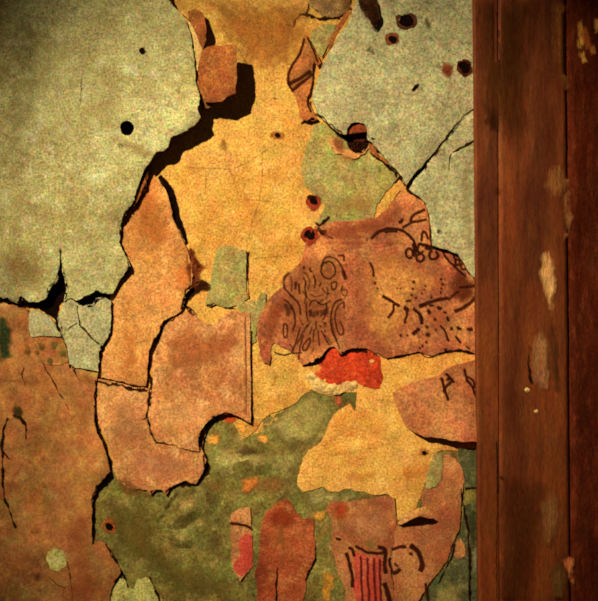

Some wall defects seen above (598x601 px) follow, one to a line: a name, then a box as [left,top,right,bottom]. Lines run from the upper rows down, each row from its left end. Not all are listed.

rust [386,14,413,45]
rust [442,59,473,76]
crack [301,113,355,146]
crack [371,120,474,194]
crack [119,167,188,280]
rust [307,196,321,211]
crack [244,252,252,299]
peeling [0,0,477,601]
crack [0,249,193,588]